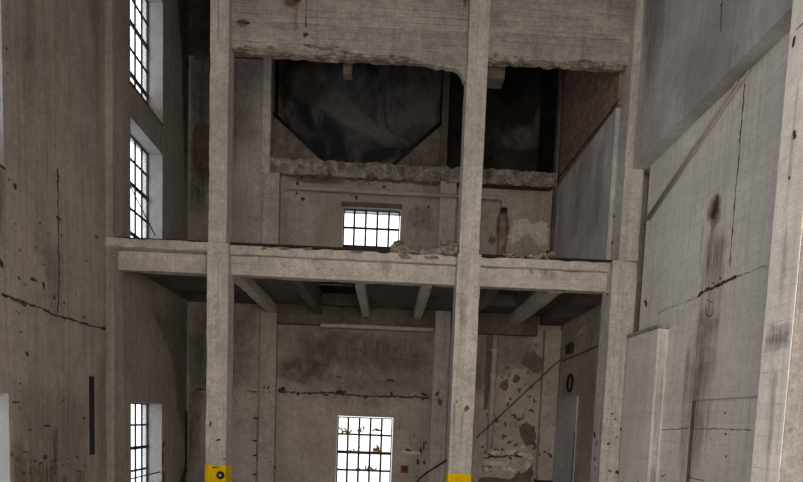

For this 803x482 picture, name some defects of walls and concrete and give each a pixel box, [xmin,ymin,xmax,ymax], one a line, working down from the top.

spalling [233,0,426,67]
crack [1,168,106,330]
spalling [269,156,460,201]
spalling [482,168,558,192]
peeling [507,218,550,247]
crack [697,82,746,317]
peeling [478,335,552,482]